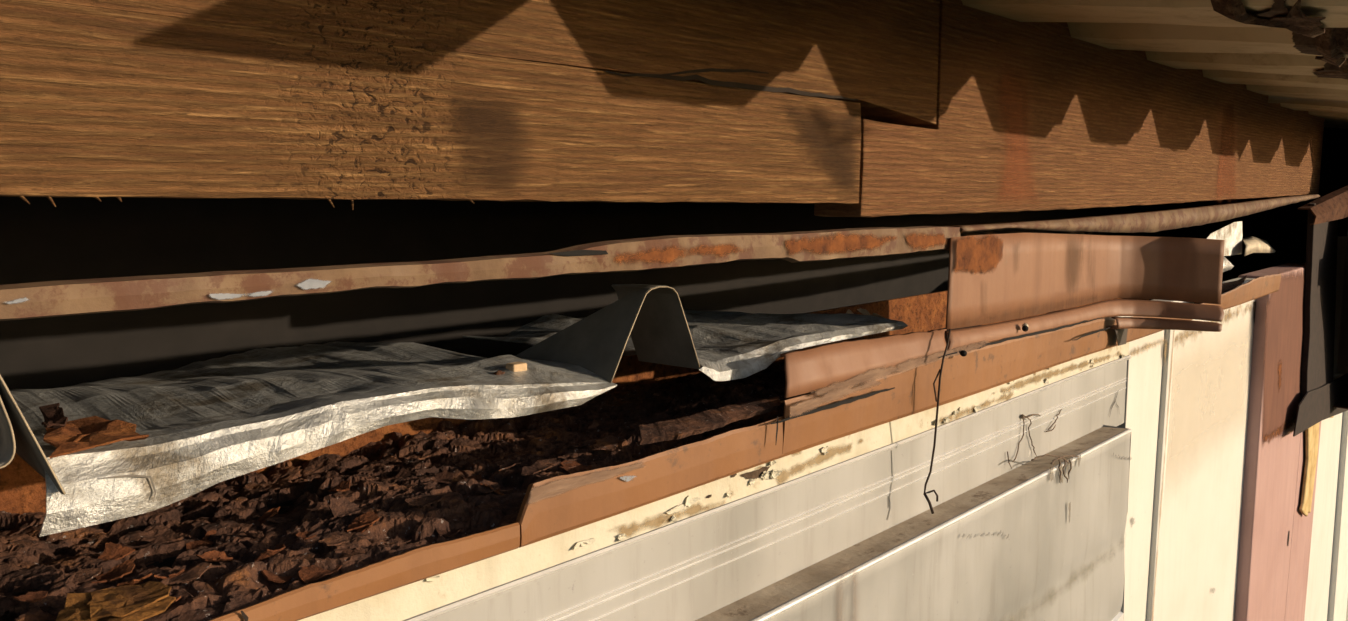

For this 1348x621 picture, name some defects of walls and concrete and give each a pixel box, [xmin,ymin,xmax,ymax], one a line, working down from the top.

crack [606,68,858,101]
corrosion [616,244,740,263]
corrosion [786,233,1003,274]
peeling [790,341,990,417]
peeling [934,352,1125,426]
peeling [529,462,645,504]
peeling [617,439,863,541]